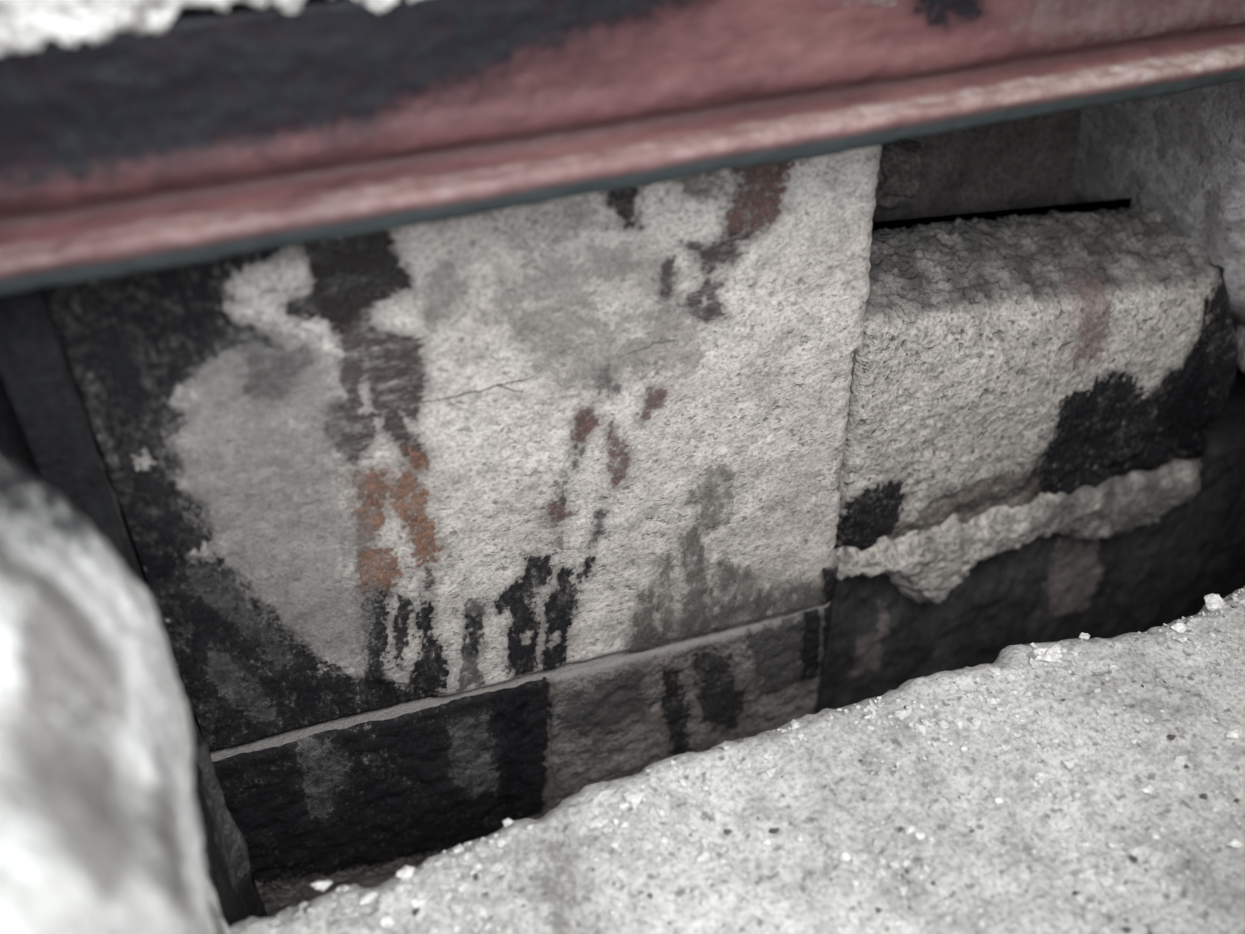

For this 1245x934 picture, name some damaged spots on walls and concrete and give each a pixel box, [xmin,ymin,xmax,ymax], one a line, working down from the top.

water stain [494,239,707,396]
rust [660,161,795,324]
water stain [156,316,379,675]
rust [284,231,449,694]
water stain [888,348,1216,540]
water stain [203,642,277,722]